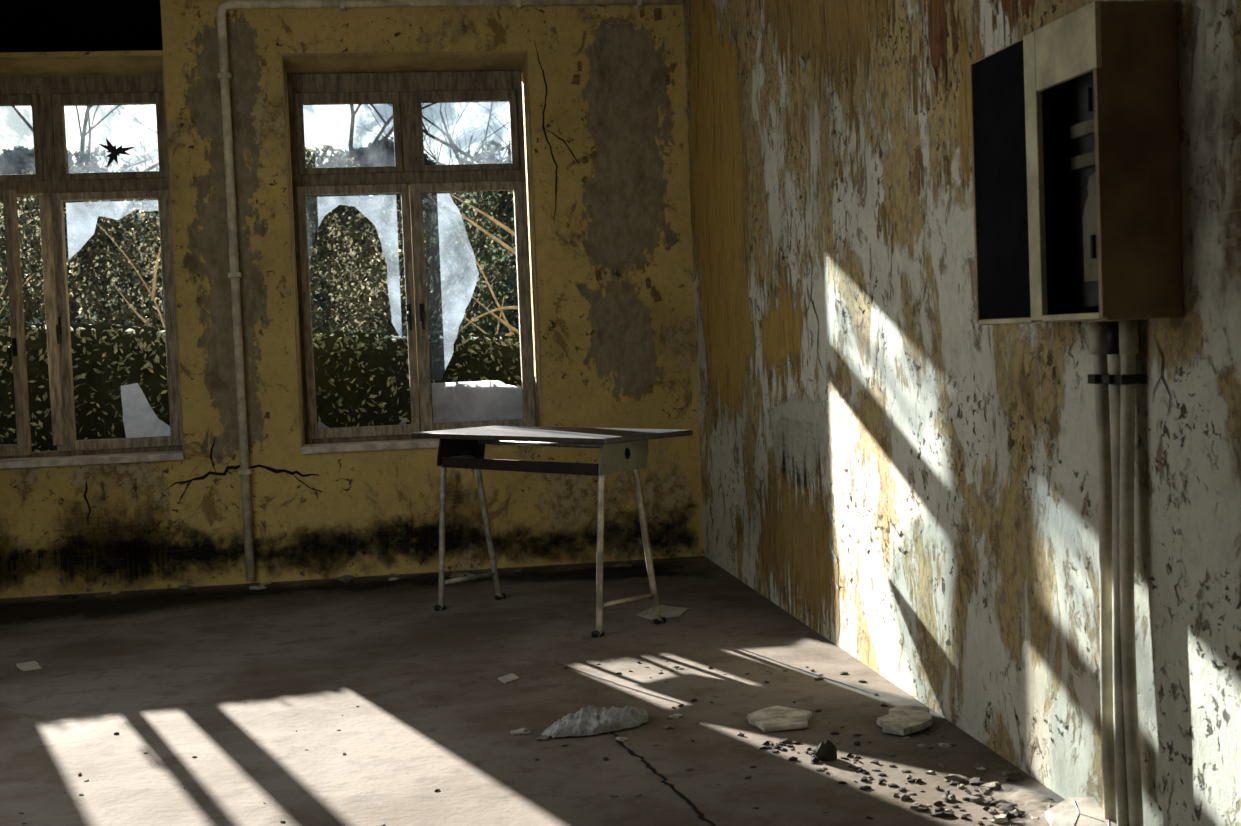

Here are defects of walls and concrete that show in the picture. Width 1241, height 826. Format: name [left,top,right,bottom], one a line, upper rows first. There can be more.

peeling [908,0,1034,197]
peeling [181,8,270,466]
peeling [877,202,889,247]
leakage [1205,98,1241,277]
crack [169,437,323,502]
peeling [752,435,904,643]
spalling [1191,626,1241,671]
crack [610,732,716,826]
spalling [1015,714,1065,752]